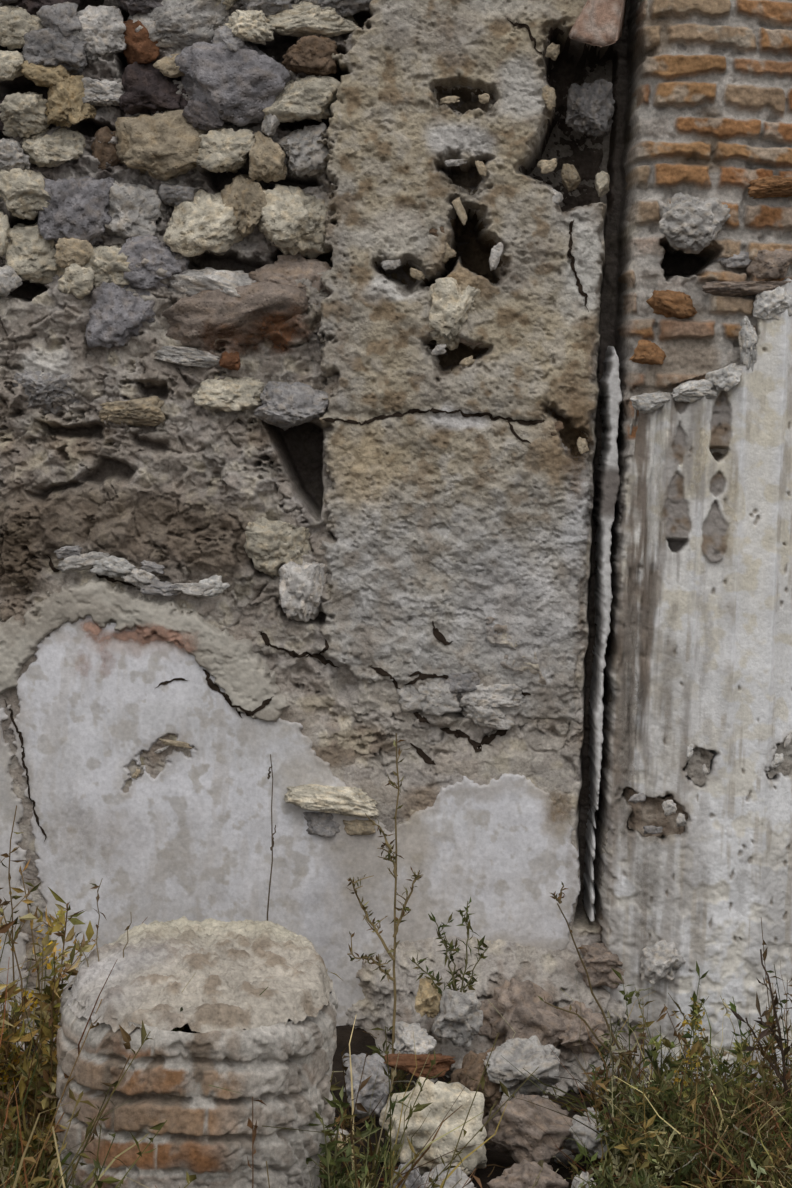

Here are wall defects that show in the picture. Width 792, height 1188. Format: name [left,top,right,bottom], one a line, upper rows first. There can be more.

crack [322,408,545,444]
spalling [131,734,192,779]
spalling [685,743,714,786]
spalling [767,733,792,778]
spalling [623,787,688,837]